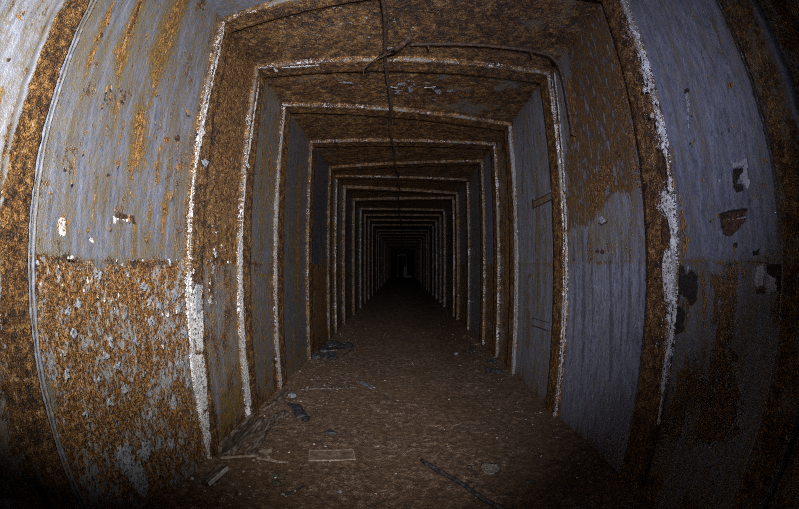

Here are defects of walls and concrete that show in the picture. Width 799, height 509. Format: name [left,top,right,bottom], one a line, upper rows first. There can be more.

corrosion [565,3,643,235]
spalling [731,158,750,192]
peeling [57,214,69,237]
corrosion [35,0,206,509]
spalling [113,212,137,225]
peeling [641,53,698,425]
spalling [719,208,748,257]